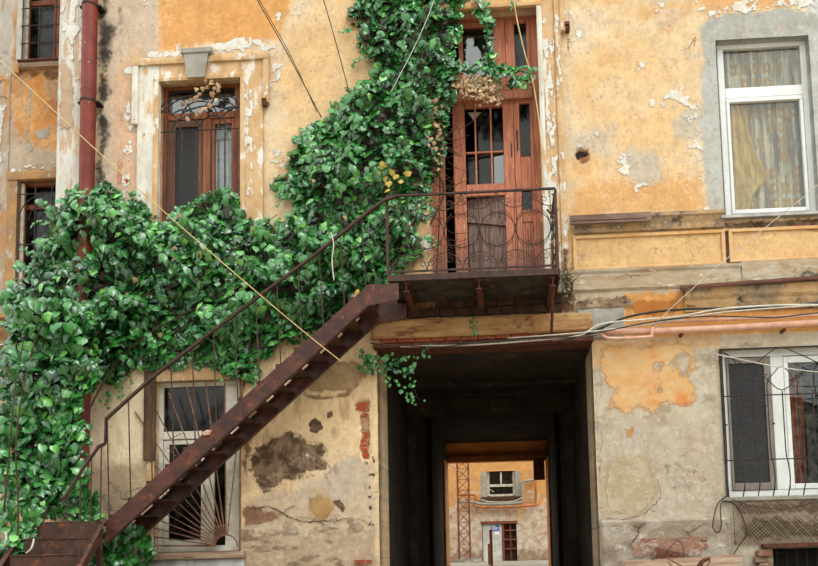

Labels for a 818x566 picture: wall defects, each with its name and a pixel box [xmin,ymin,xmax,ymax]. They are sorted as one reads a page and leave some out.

peeling [695,0,815,17]
peeling [27,0,82,153]
damp [96,115,109,181]
damp [99,0,115,101]
peeling [542,10,582,245]
peeling [649,81,700,125]
peeling [576,295,697,414]
spalling [309,411,333,433]
spalling [249,431,338,494]
spalling [355,401,375,510]
spalling [242,506,303,535]
crack [242,506,347,529]